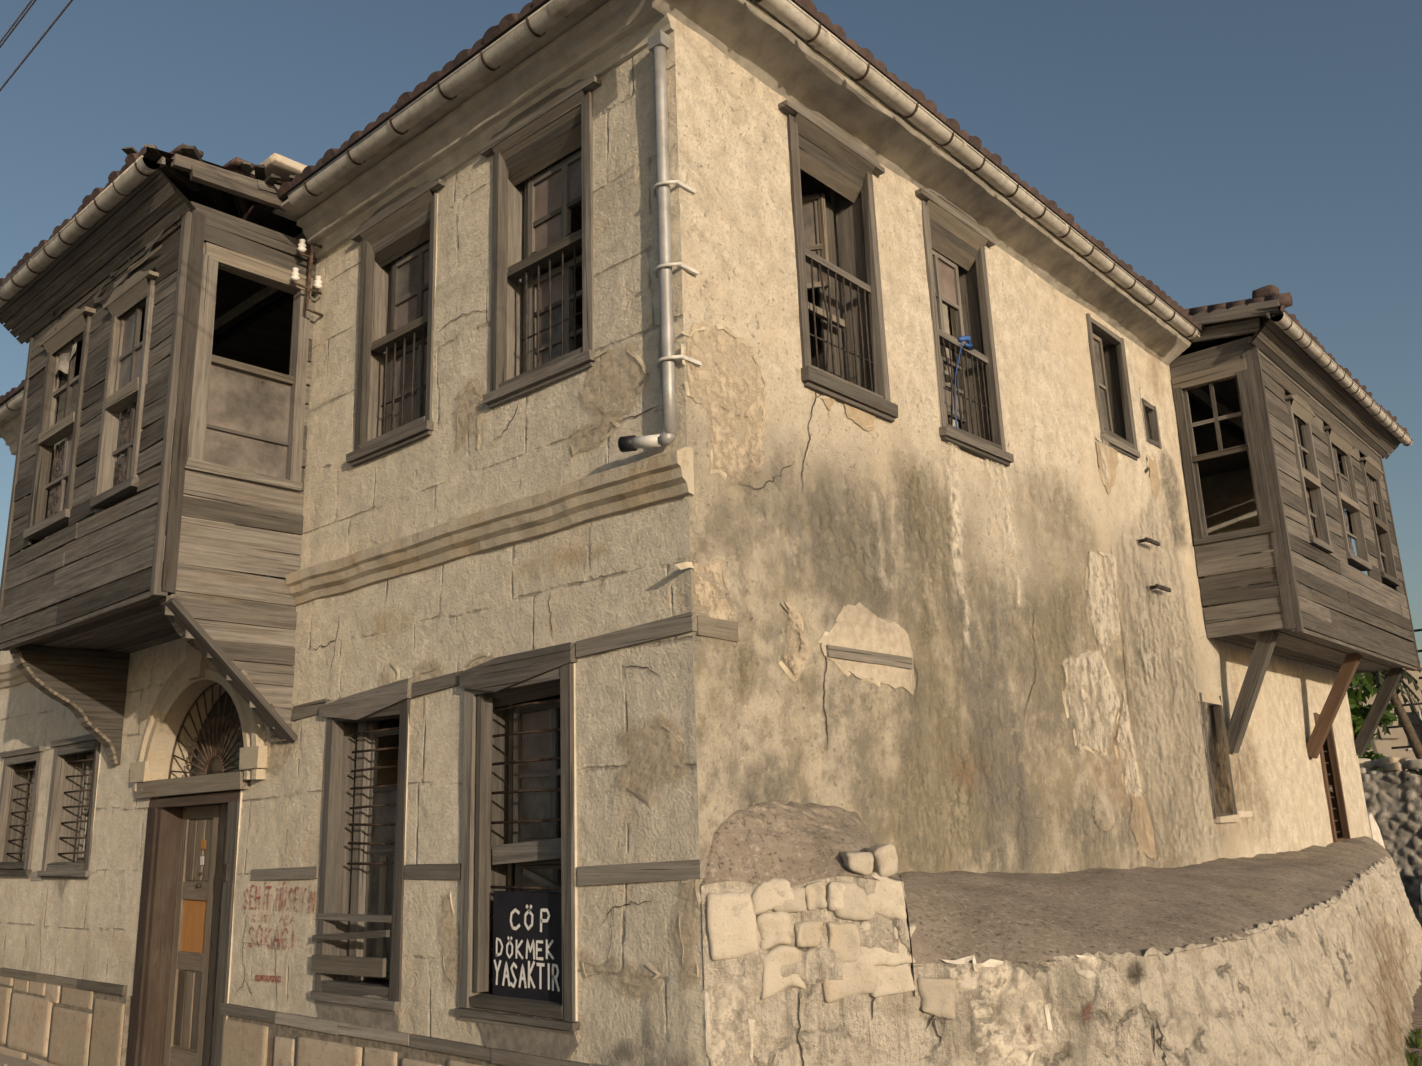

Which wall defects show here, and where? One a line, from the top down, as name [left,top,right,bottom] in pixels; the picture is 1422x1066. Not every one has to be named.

spalling [570,346,651,457]
spalling [681,322,767,482]
crack [740,391,821,491]
leakage [1163,454,1185,547]
spalling [778,600,916,695]
leakage [782,442,1027,873]
spalling [1060,551,1156,860]
crack [796,991,804,1066]